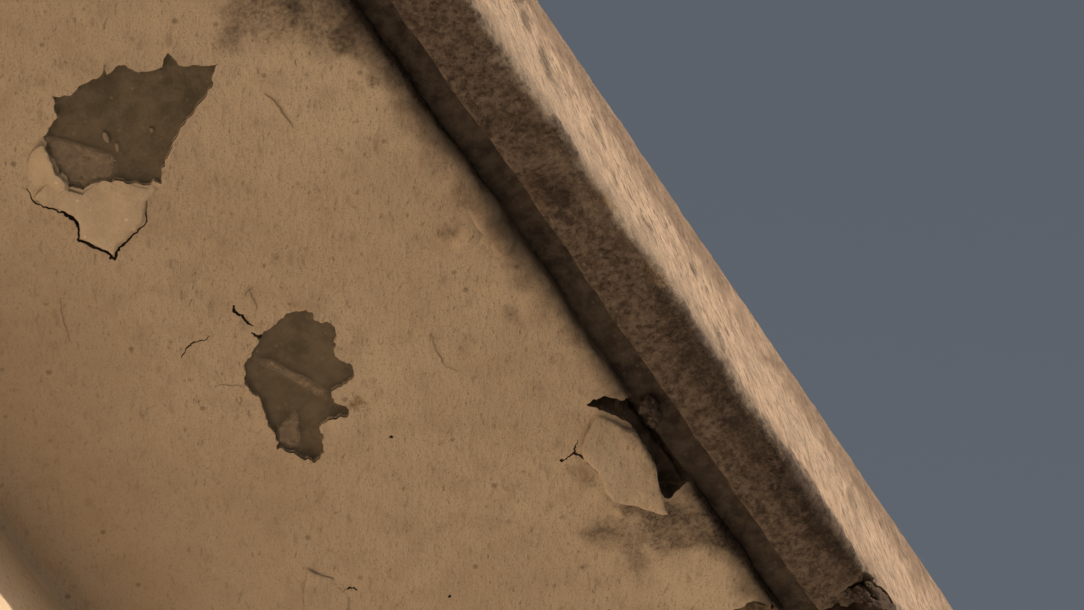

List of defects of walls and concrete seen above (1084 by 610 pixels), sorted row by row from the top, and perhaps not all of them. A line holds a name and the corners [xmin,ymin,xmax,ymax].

peeling [26,53,217,261]
peeling [244,310,354,462]
spalling [582,388,690,515]
spalling [734,601,778,610]
spalling [824,571,896,610]